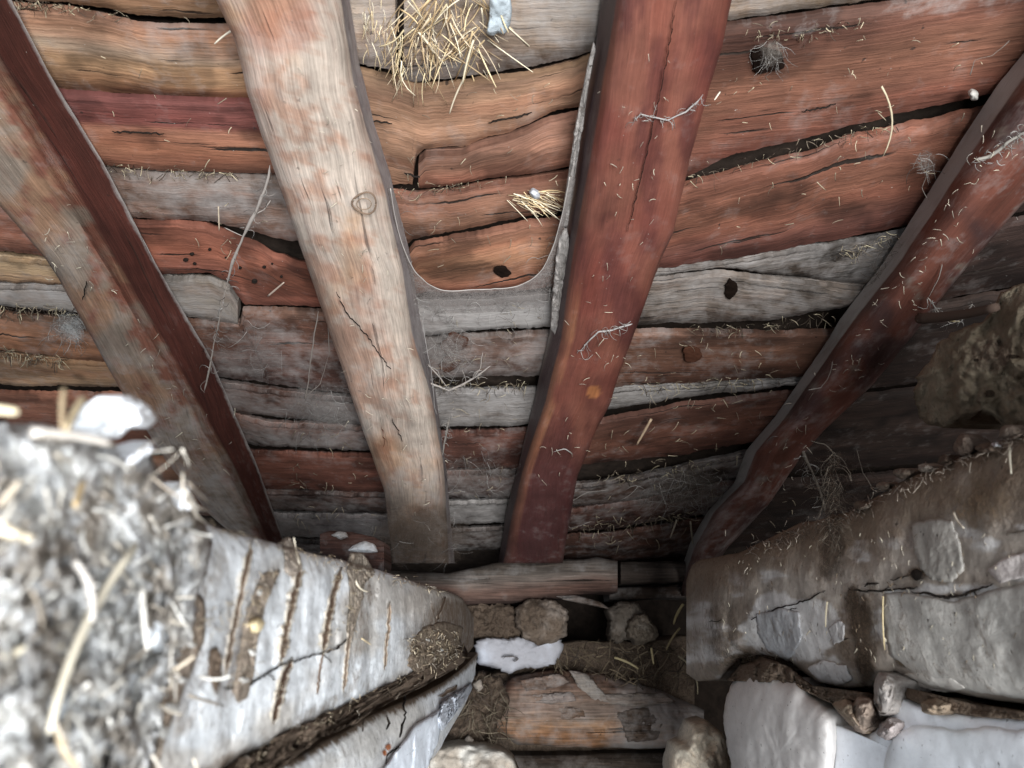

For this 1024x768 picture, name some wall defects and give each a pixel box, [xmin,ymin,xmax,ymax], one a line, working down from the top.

crack [628,0,677,228]
crack [849,575,993,599]
crack [751,591,824,620]